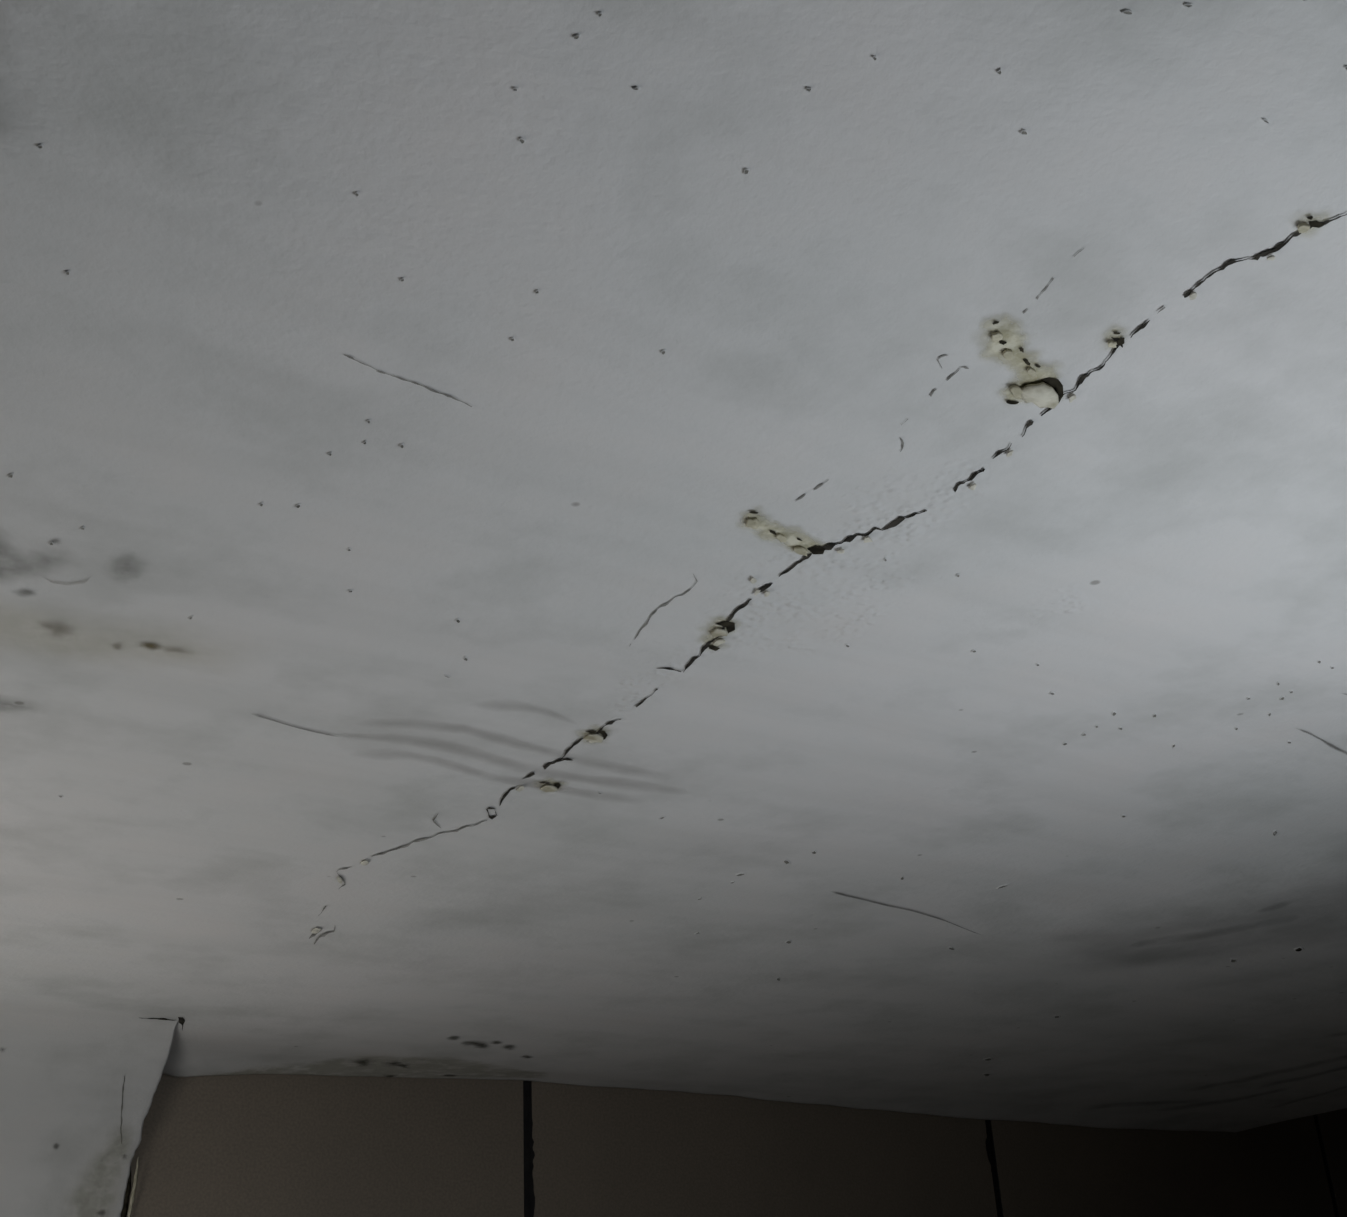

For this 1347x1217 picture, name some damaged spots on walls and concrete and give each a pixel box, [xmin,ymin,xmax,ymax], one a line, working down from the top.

crack [345,355,472,407]
crack [930,355,969,397]
spalling [984,319,1063,409]
crack [954,214,1347,492]
spalling [743,511,825,556]
crack [309,510,927,944]
crack [143,1017,185,1030]
crack [118,1076,126,1143]